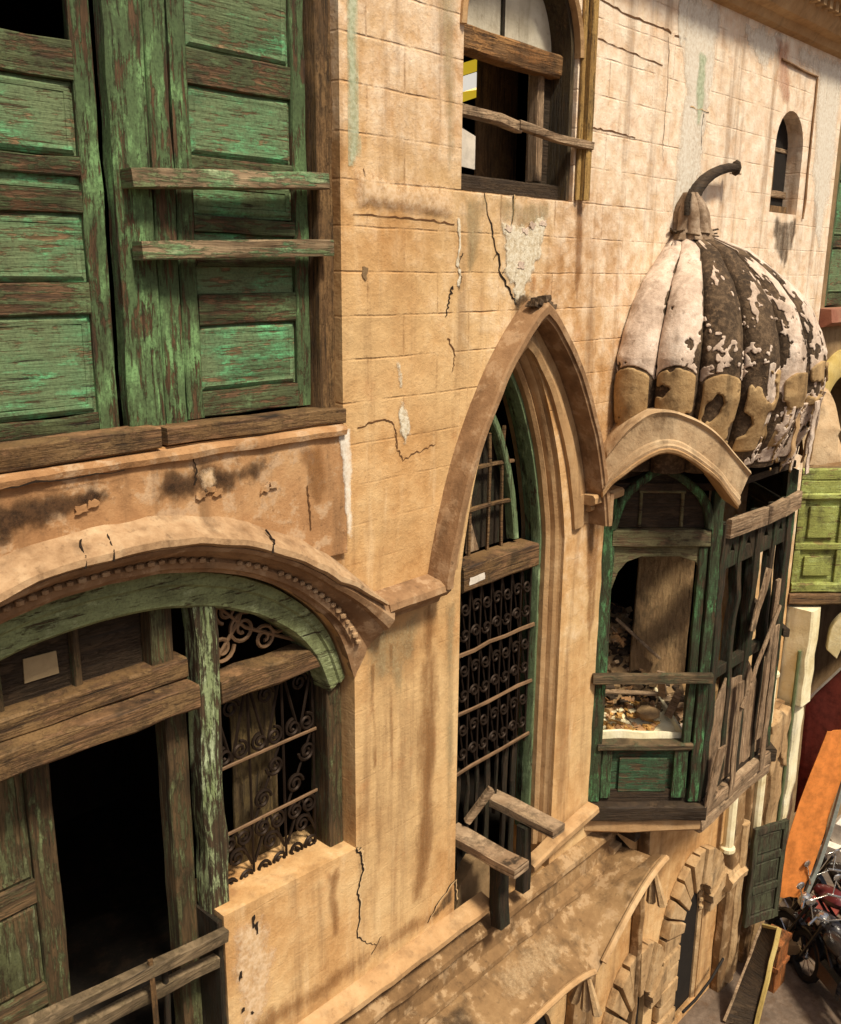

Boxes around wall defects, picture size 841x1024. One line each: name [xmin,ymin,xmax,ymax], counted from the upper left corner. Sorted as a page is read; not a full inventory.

crack [354,214,454,225]
crack [484,193,517,305]
spalling [502,205,557,310]
damp [775,220,796,263]
crack [358,419,434,461]
peeling [399,404,410,443]
damp [161,464,262,497]
peeling [339,430,352,534]
damp [0,488,103,545]
crack [356,847,382,953]